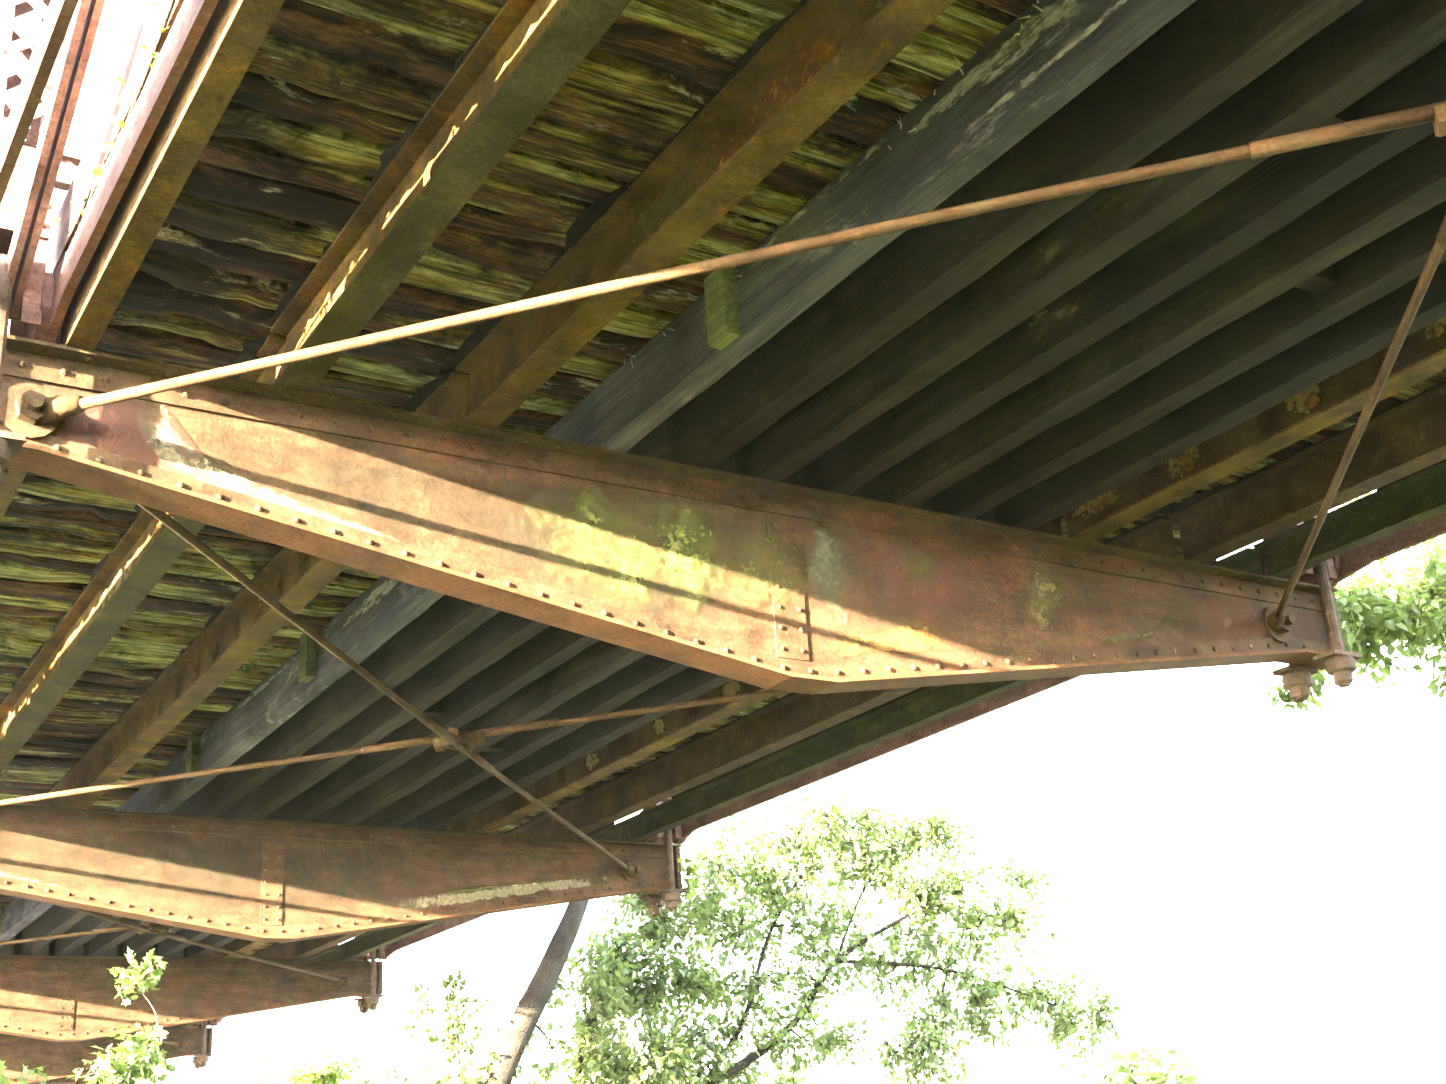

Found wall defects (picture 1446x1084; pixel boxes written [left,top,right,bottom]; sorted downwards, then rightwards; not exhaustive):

water stain [142,409,397,541]
rust [1051,487,1120,532]
water stain [451,486,710,616]
rust [100,555,134,609]
rust [831,623,948,655]